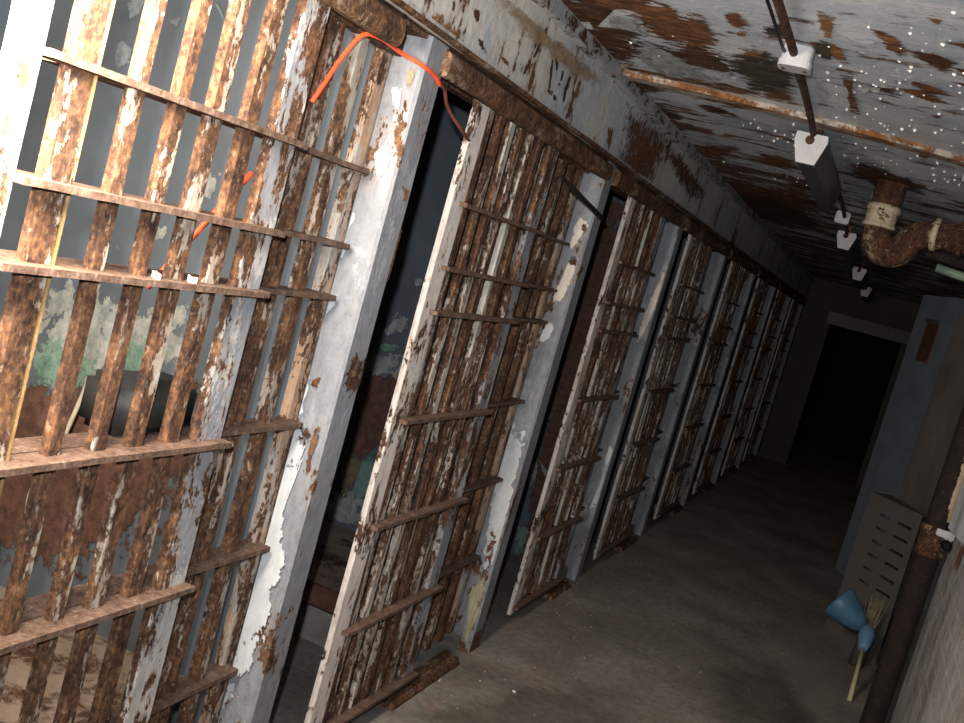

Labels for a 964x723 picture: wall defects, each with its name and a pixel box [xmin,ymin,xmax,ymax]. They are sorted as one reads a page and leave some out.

peeling [605,17,721,82]
rust [870,29,964,86]
peeling [392,87,402,121]
rust [902,81,953,104]
peeling [374,140,392,181]
peeling [366,311,408,380]
rust [515,191,626,557]
rust [14,379,52,439]
rust [68,386,89,434]
rust [296,418,320,473]
peeling [325,491,365,525]
peeling [222,376,310,710]